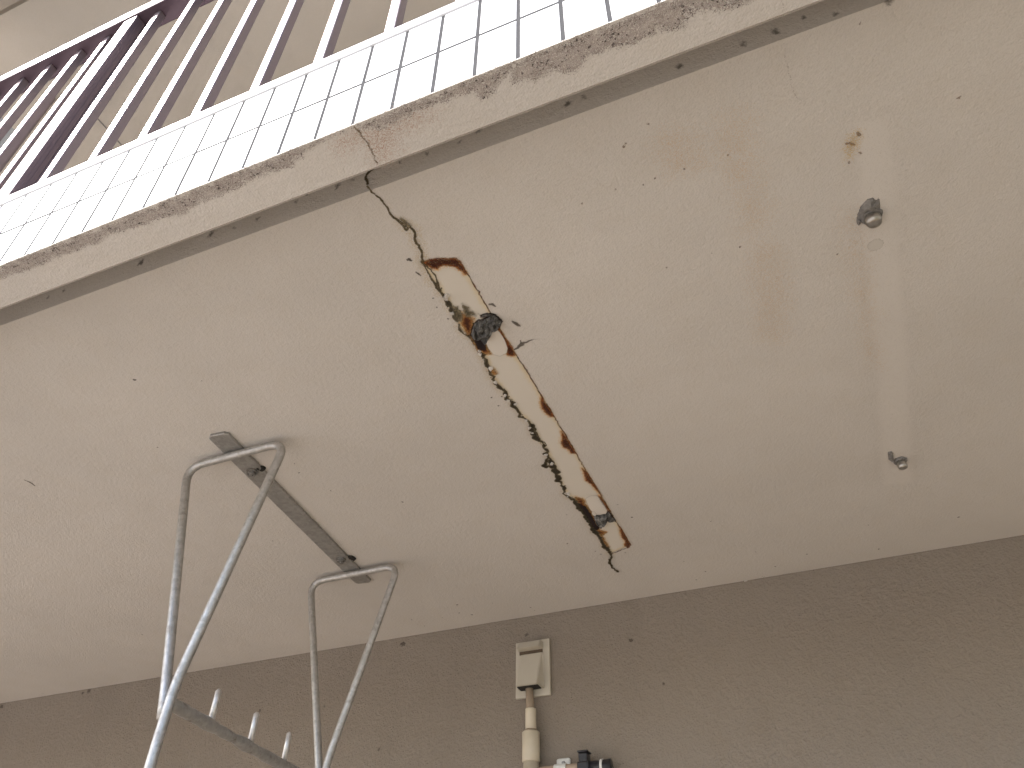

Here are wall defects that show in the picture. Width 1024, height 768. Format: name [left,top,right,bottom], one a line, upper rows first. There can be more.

corrosion [421,257,489,311]
crack [319,93,619,572]
peeling [407,258,625,553]
corrosion [458,311,631,548]